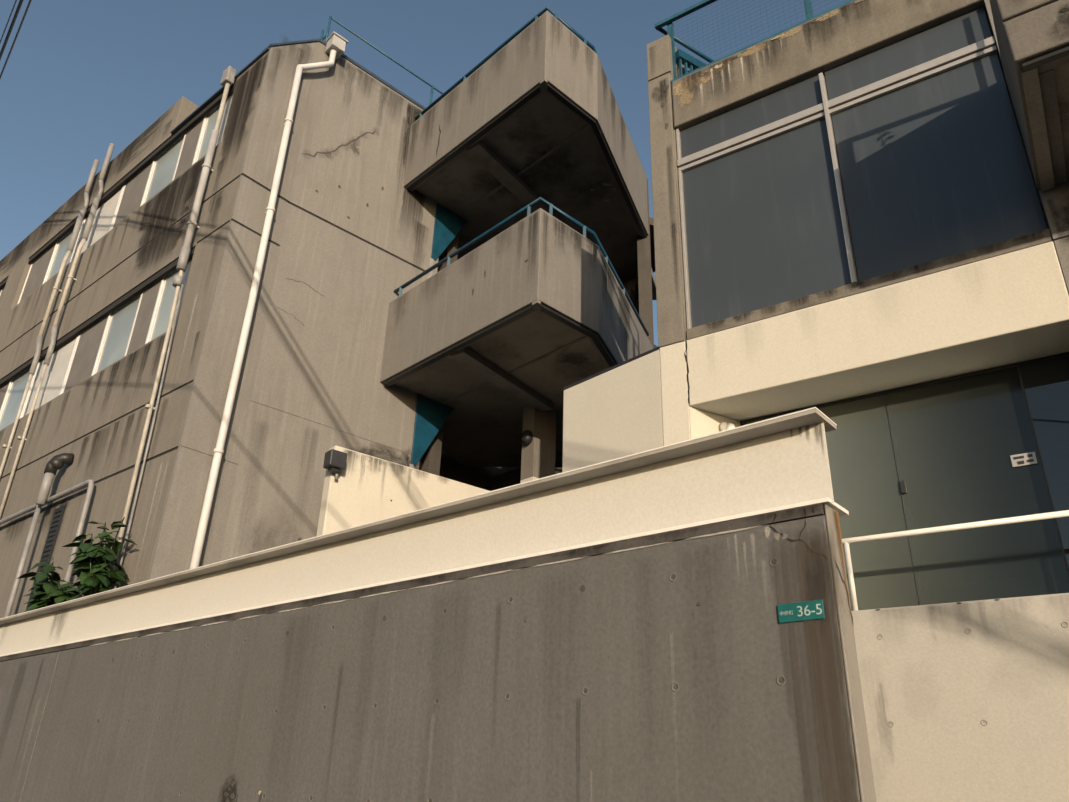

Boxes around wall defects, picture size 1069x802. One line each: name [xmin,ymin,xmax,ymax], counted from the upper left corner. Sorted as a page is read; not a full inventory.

peeling [661,11,837,107]
crack [302,130,376,157]
leakage [128,158,205,261]
crack [683,340,691,403]
crack [768,507,854,625]